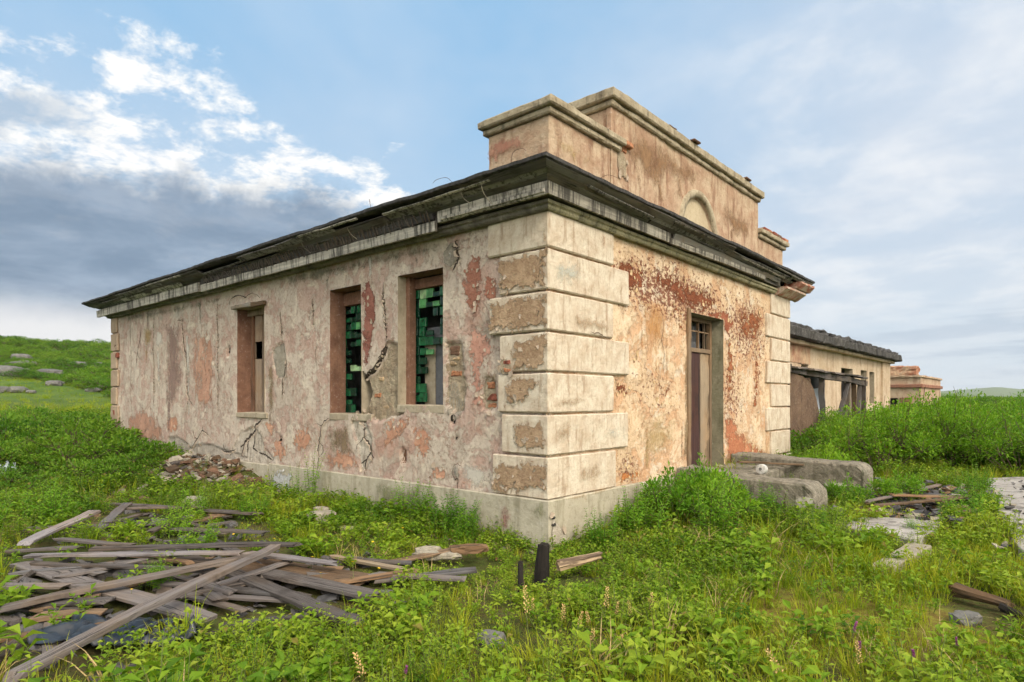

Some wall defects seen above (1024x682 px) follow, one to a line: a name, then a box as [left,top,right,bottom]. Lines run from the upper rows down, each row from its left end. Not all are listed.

crack [180,293,283,461]
crack [316,418,329,470]
crack [356,421,374,476]
crack [365,282,389,381]
flaking render [326,281,445,480]
flaking render [443,243,513,416]
peeling [619,260,766,462]